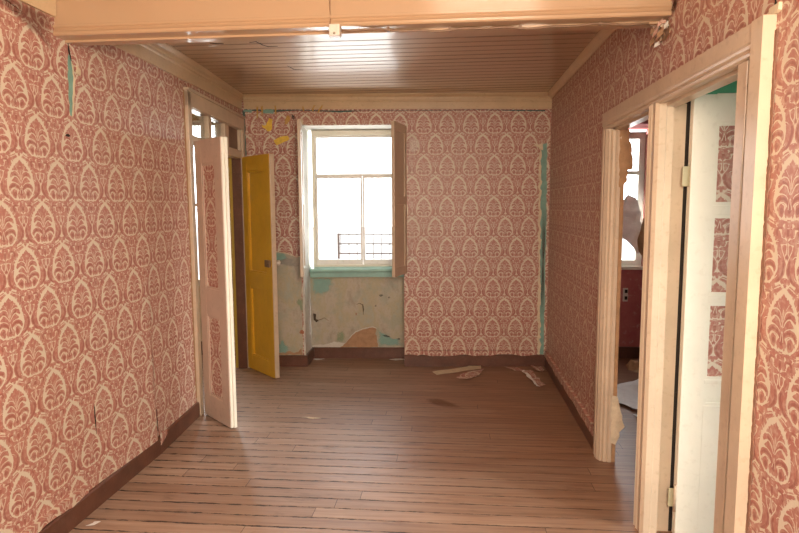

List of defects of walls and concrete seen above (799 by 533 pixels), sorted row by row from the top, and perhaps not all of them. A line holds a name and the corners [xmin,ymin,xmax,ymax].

peeling [68,44,81,116]
spalling [650,19,670,48]
peeling [534,143,547,355]
flaking render [276,251,378,355]